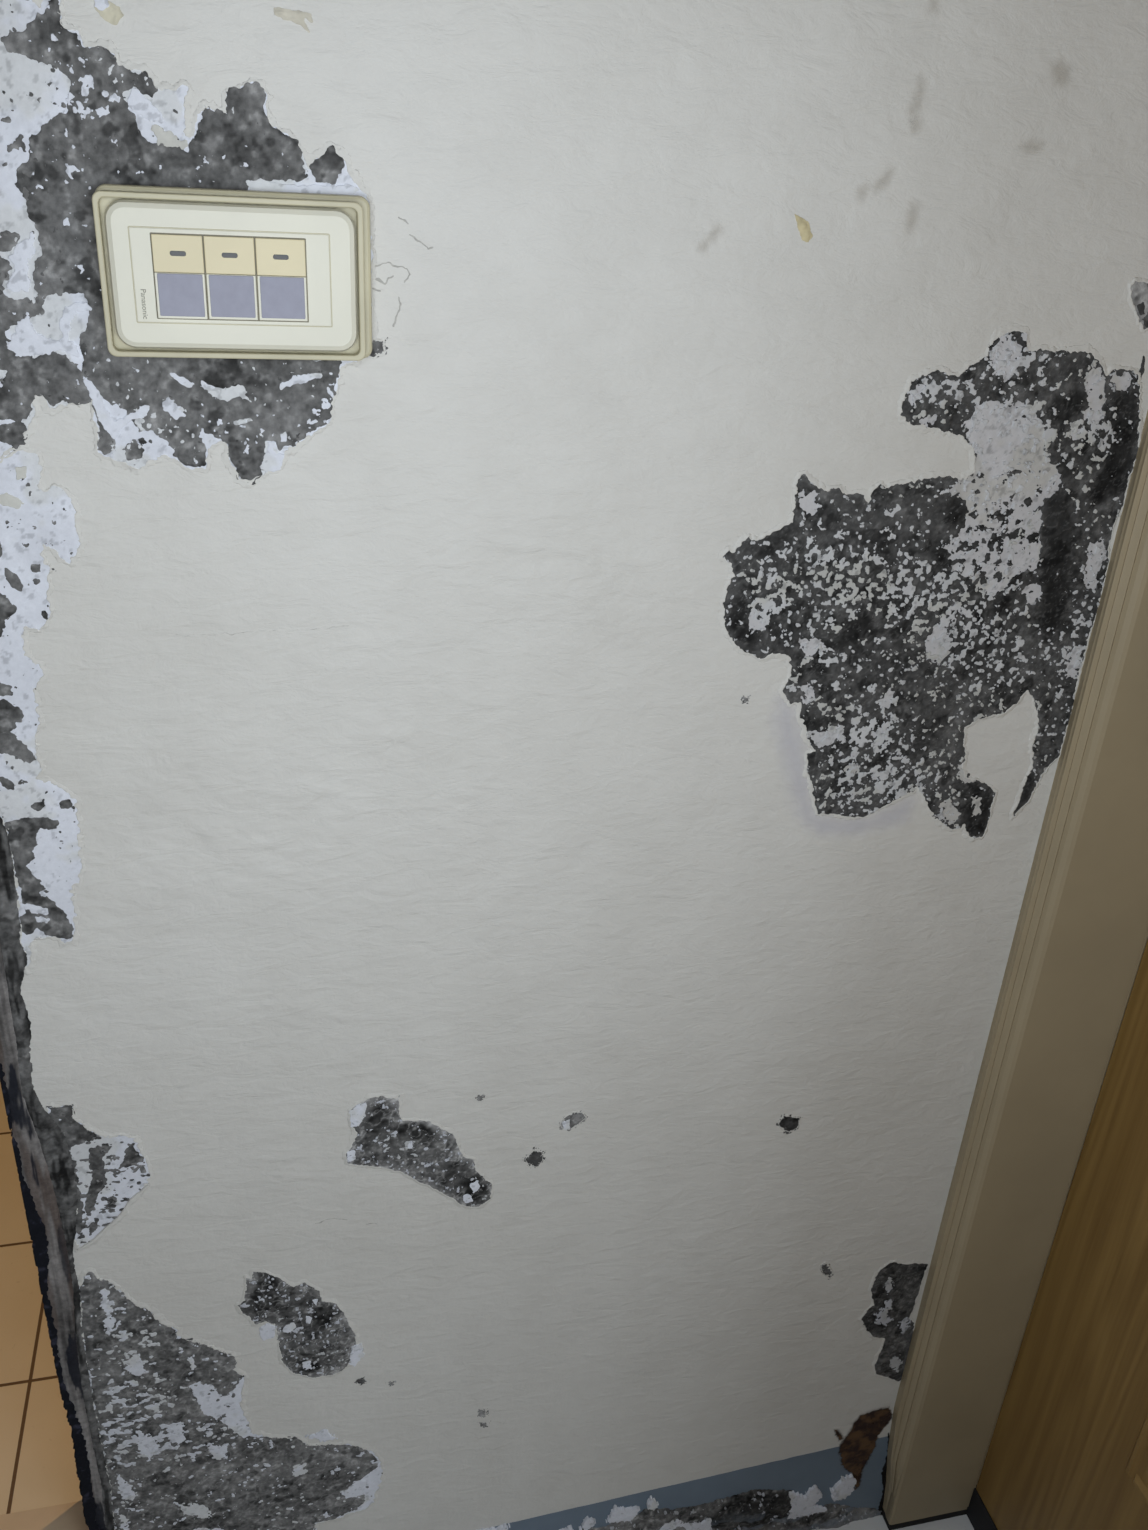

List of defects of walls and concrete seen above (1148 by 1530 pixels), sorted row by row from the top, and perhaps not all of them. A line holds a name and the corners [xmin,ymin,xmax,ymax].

flaking render [1127,277,1148,333]
flaking render [717,323,1145,842]
peeling [0,0,388,1530]
flaking render [342,1093,494,1210]
peeling [524,1147,546,1168]
peeling [559,1110,588,1131]
peeling [776,1114,803,1134]
peeling [819,1261,834,1280]
flaking render [858,1259,929,1382]
rust [834,1408,892,1490]
spalling [559,1473,882,1530]